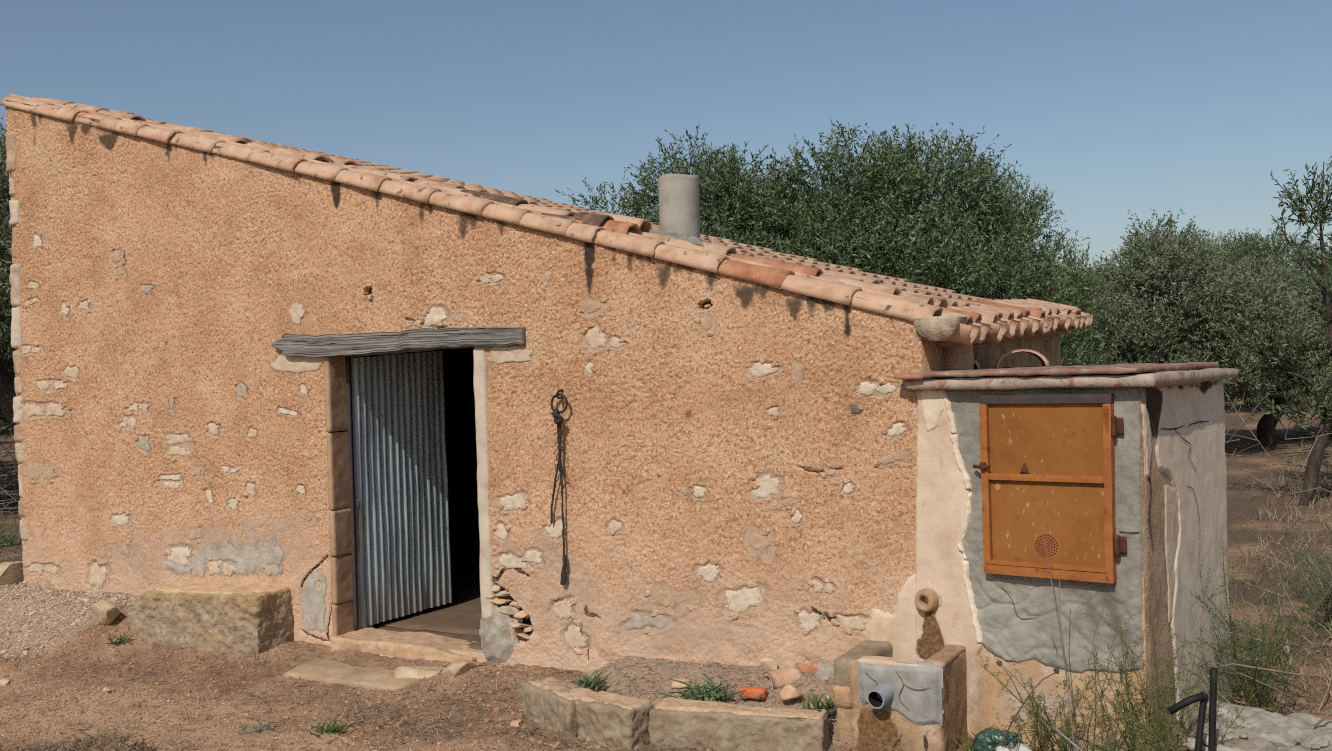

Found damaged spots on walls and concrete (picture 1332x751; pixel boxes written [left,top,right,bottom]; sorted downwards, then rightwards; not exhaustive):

leakage [67,124,119,149]
leakage [584,242,594,290]
leakage [612,248,692,286]
spalling [5,132,80,541]
leakage [734,286,768,306]
leakage [787,296,851,336]
spalling [746,469,804,525]
spalling [164,544,236,579]
spalling [485,490,569,639]
spalling [692,558,770,620]
leakage [916,612,944,658]